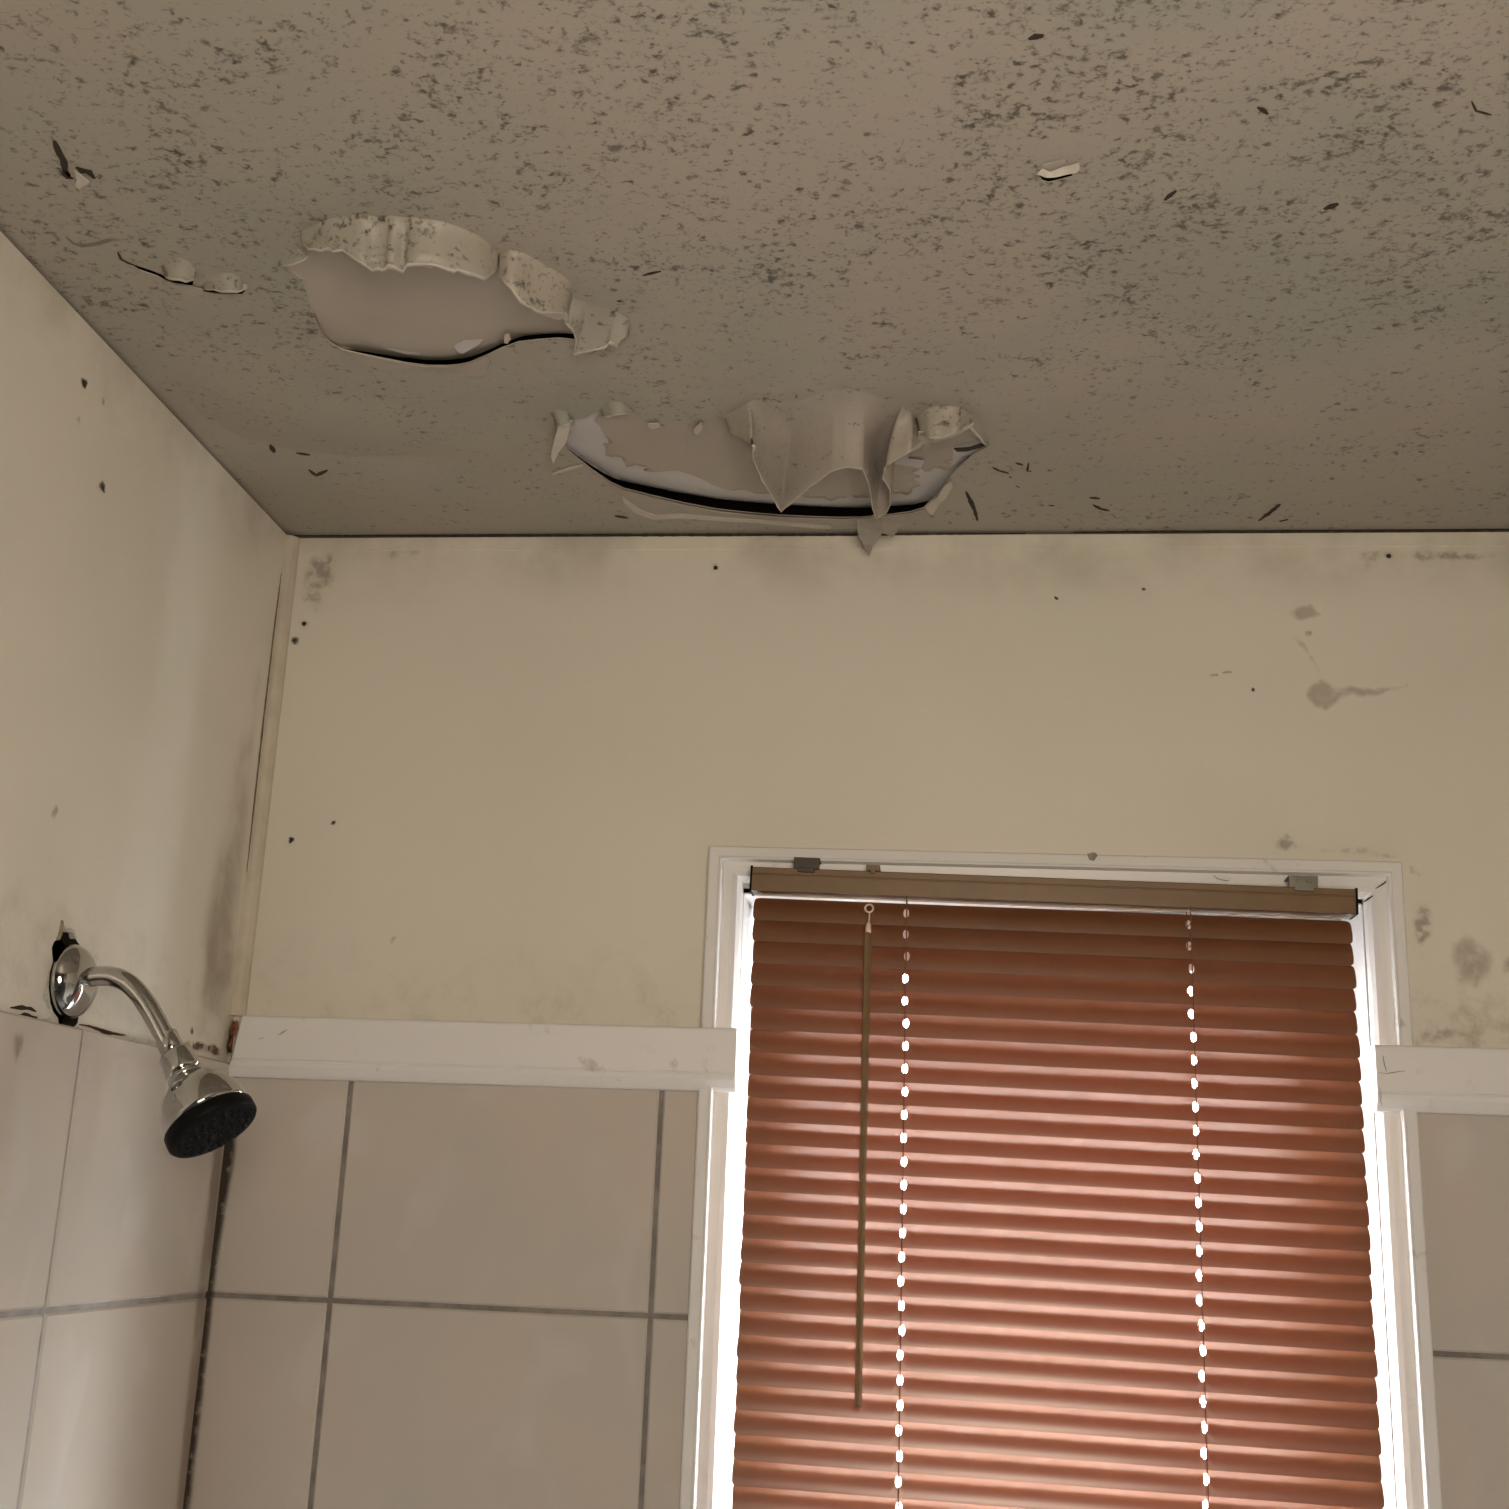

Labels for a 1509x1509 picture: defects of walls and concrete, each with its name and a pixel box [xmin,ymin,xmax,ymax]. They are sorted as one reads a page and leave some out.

peeling [278,215,630,378]
peeling [551,389,989,556]